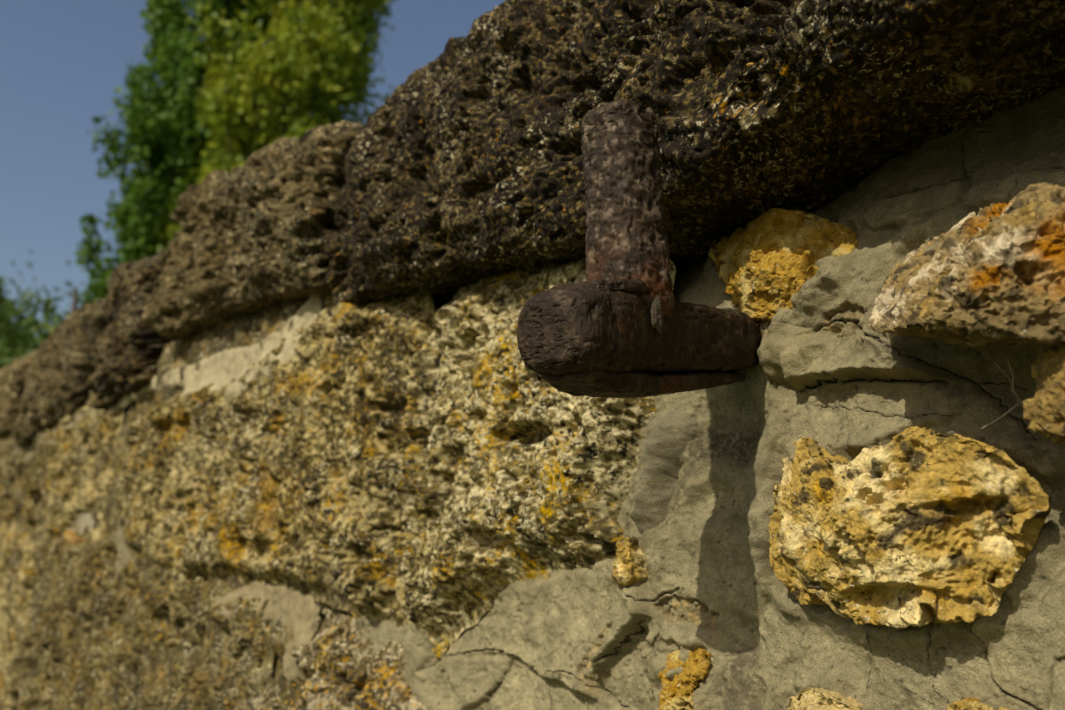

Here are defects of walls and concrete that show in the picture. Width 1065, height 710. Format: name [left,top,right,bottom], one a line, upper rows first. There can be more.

crack [801,319,1037,440]
crack [597,589,679,661]
crack [430,649,515,710]
crack [547,670,629,709]